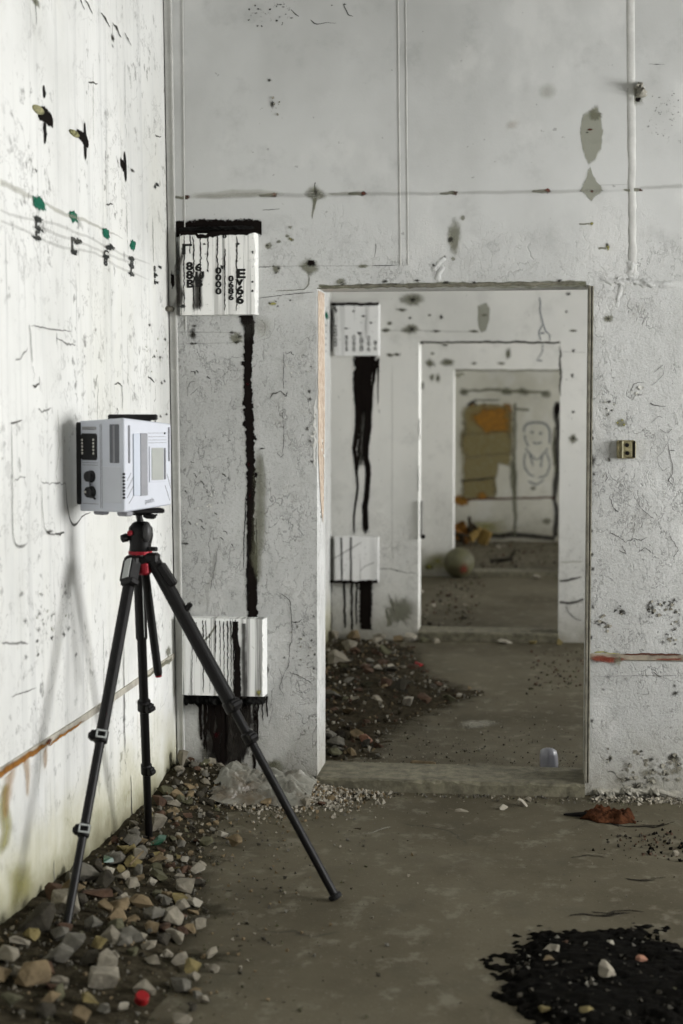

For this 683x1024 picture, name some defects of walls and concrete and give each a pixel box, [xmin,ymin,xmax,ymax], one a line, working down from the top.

leakage [269,260,586,541]
leakage [184,315,268,769]
leakage [330,580,378,630]
rust [593,651,681,665]
rust [0,721,83,778]